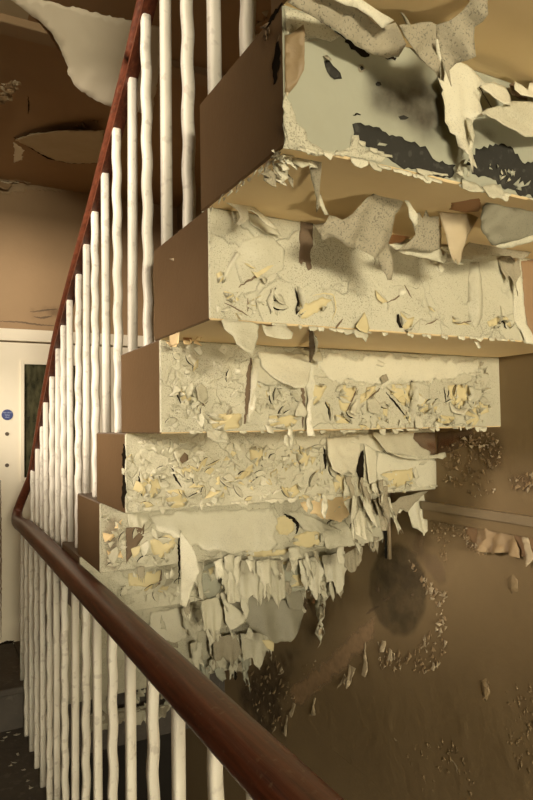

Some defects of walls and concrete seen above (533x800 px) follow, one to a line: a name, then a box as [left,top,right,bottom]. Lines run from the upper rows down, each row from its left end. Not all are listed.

peeling [13,120,104,164]
peeling [11,0,132,107]
peeling [151,25,160,115]
peeling [202,0,533,349]
water stain [376,83,438,129]
peeling [101,252,533,690]